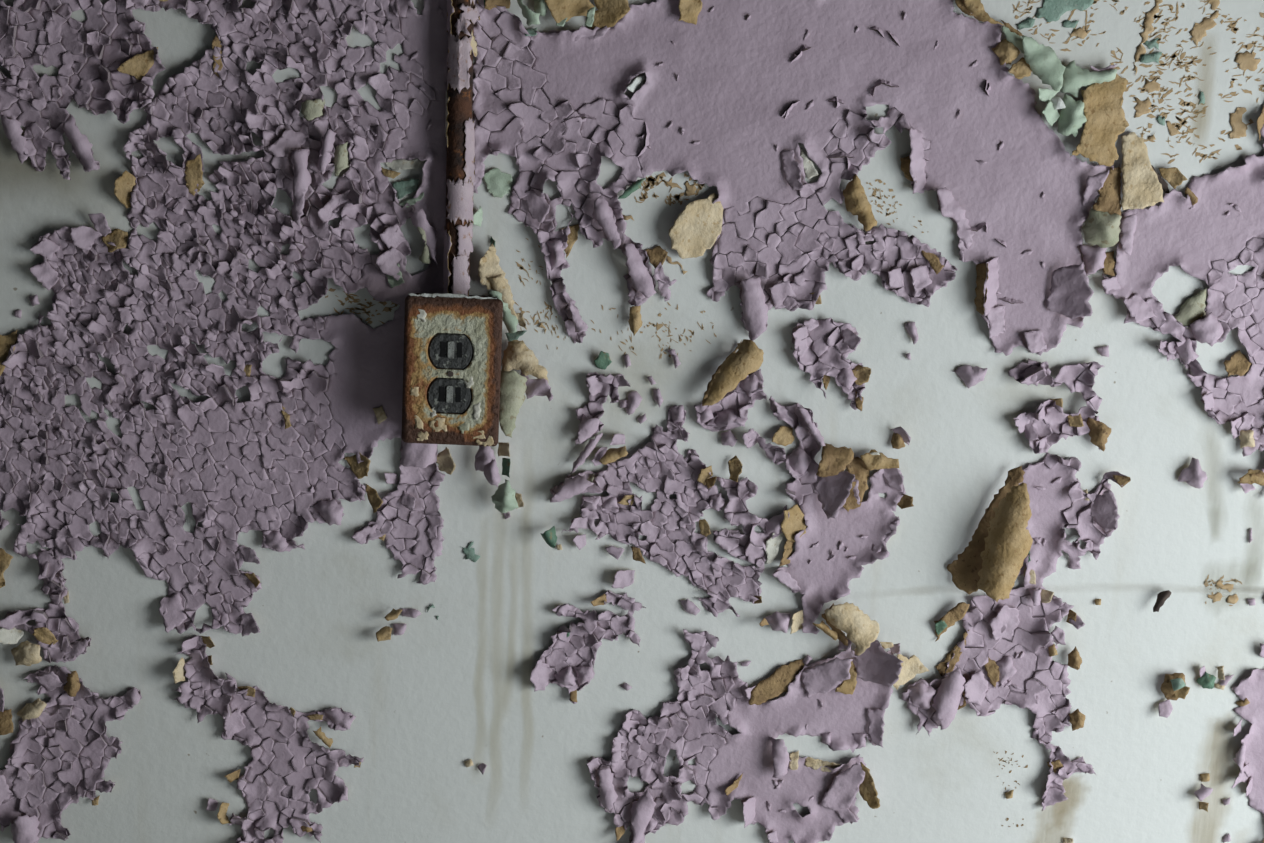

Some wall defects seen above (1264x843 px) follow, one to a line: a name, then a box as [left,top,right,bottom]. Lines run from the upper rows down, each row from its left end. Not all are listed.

peeling [0,0,1264,666]
peeling [0,665,142,843]
peeling [172,635,364,843]
peeling [530,570,646,704]
peeling [550,372,929,843]
peeling [901,358,1131,811]
peeling [1158,643,1264,818]